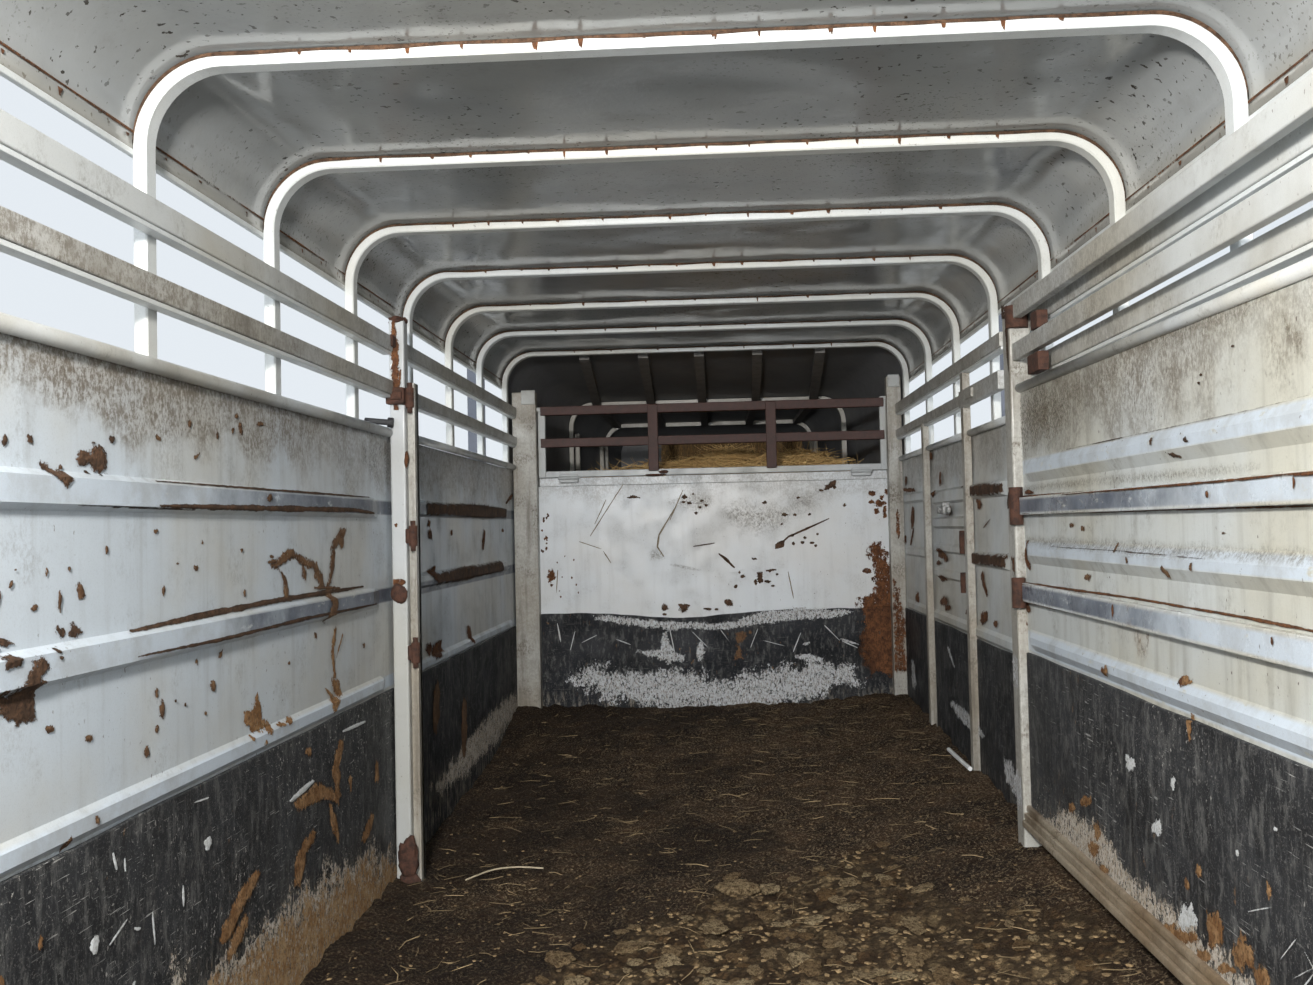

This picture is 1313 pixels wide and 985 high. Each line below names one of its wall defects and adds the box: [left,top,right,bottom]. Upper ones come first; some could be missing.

rust [156,120,1225,230]
rust [280,202,1109,387]
rust [868,476,915,545]
rust [961,471,1313,528]
rust [130,586,364,632]
rust [138,603,377,657]
rust [855,541,919,679]
rust [936,540,1313,645]